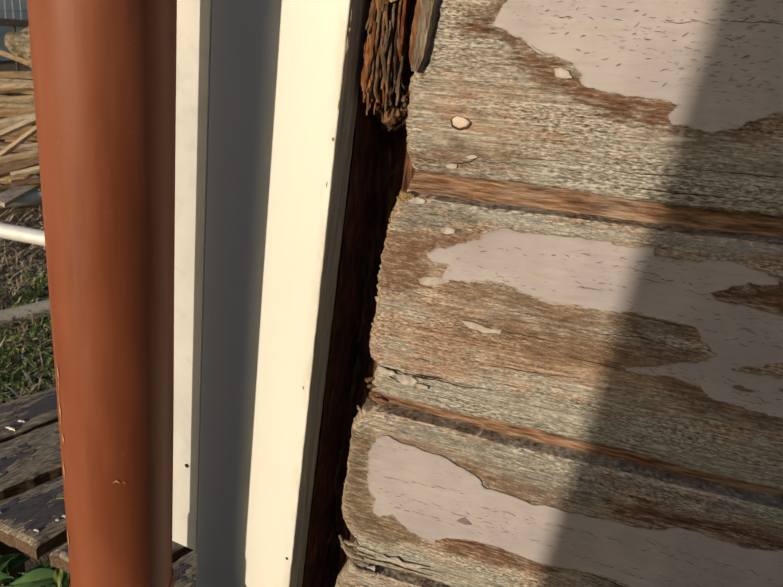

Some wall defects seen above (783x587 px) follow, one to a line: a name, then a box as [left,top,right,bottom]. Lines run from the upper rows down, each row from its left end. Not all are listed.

peeling [492,0,783,142]
peeling [376,363,428,390]
peeling [418,227,783,418]
peeling [366,435,783,587]